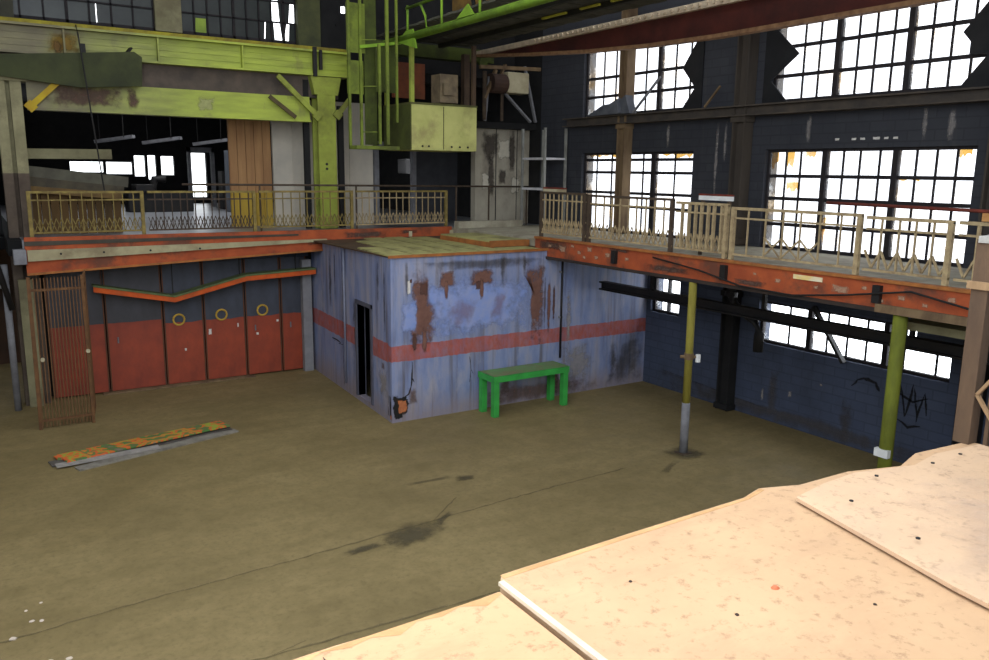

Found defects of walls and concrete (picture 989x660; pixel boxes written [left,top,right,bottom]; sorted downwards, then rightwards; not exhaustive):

rust [440,272,454,298]
rust [472,270,493,297]
rust [527,266,555,331]
rust [411,280,434,351]
leakage [389,513,450,545]
leakage [349,544,378,554]